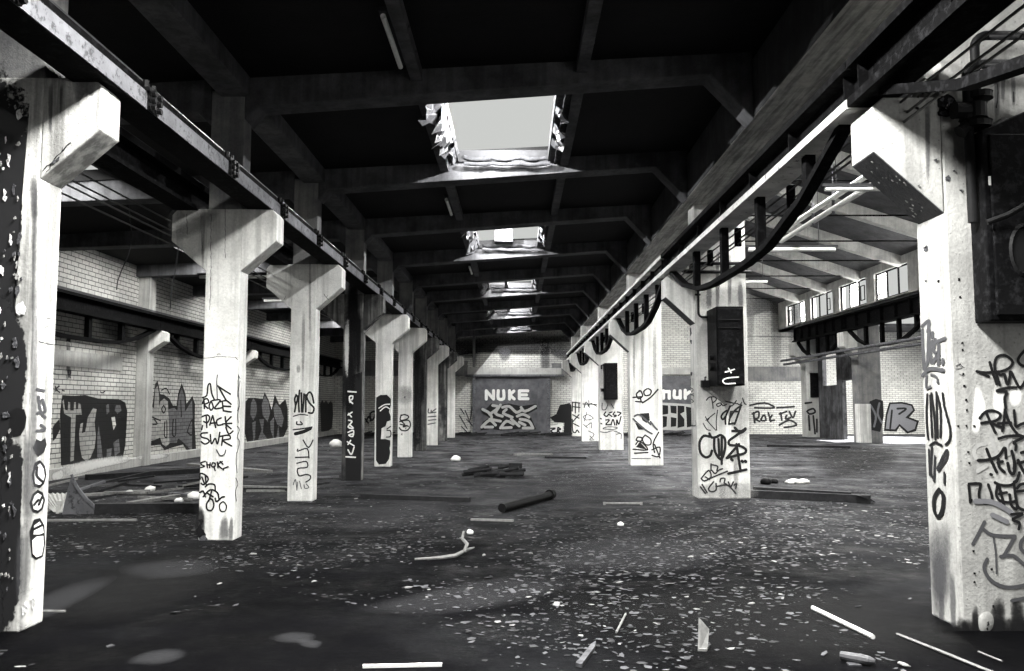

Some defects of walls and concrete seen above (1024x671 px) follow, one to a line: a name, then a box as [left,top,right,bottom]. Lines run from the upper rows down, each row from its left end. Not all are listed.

peeling [0,70,39,633]
crack [43,142,71,172]